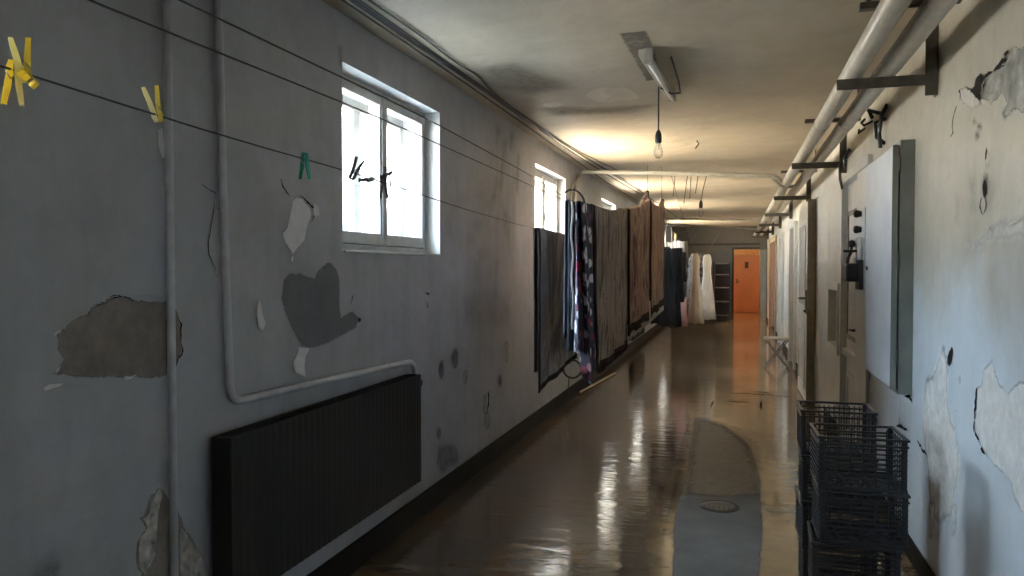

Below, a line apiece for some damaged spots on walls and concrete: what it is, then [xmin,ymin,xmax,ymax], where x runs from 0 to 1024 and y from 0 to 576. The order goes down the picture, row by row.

spalling [950,42,1024,137]
spalling [43,290,185,391]
peeling [280,180,361,377]
peeling [923,347,958,534]
peeling [973,358,1024,517]
spalling [132,483,208,576]